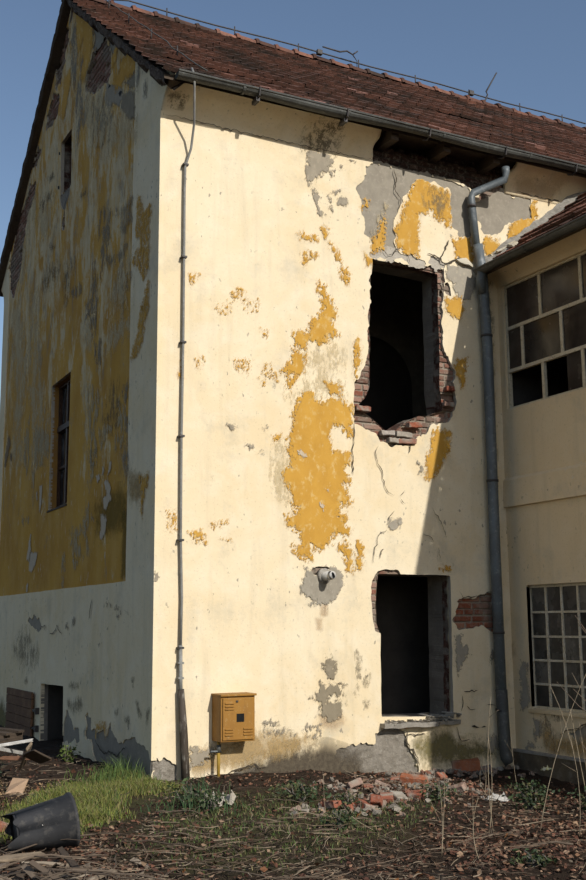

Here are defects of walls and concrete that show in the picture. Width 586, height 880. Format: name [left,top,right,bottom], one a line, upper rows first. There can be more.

flaking render [48,14,136,128]
flaking render [9,183,36,298]
peeling [71,195,152,365]
peeling [215,286,261,315]
flaking render [295,151,356,286]
flaking render [356,148,539,320]
peeling [234,281,365,607]
peeling [416,426,453,481]
flaking render [388,518,403,530]
flaking render [452,593,493,677]
flaking render [64,710,176,781]
flaking render [263,657,348,739]